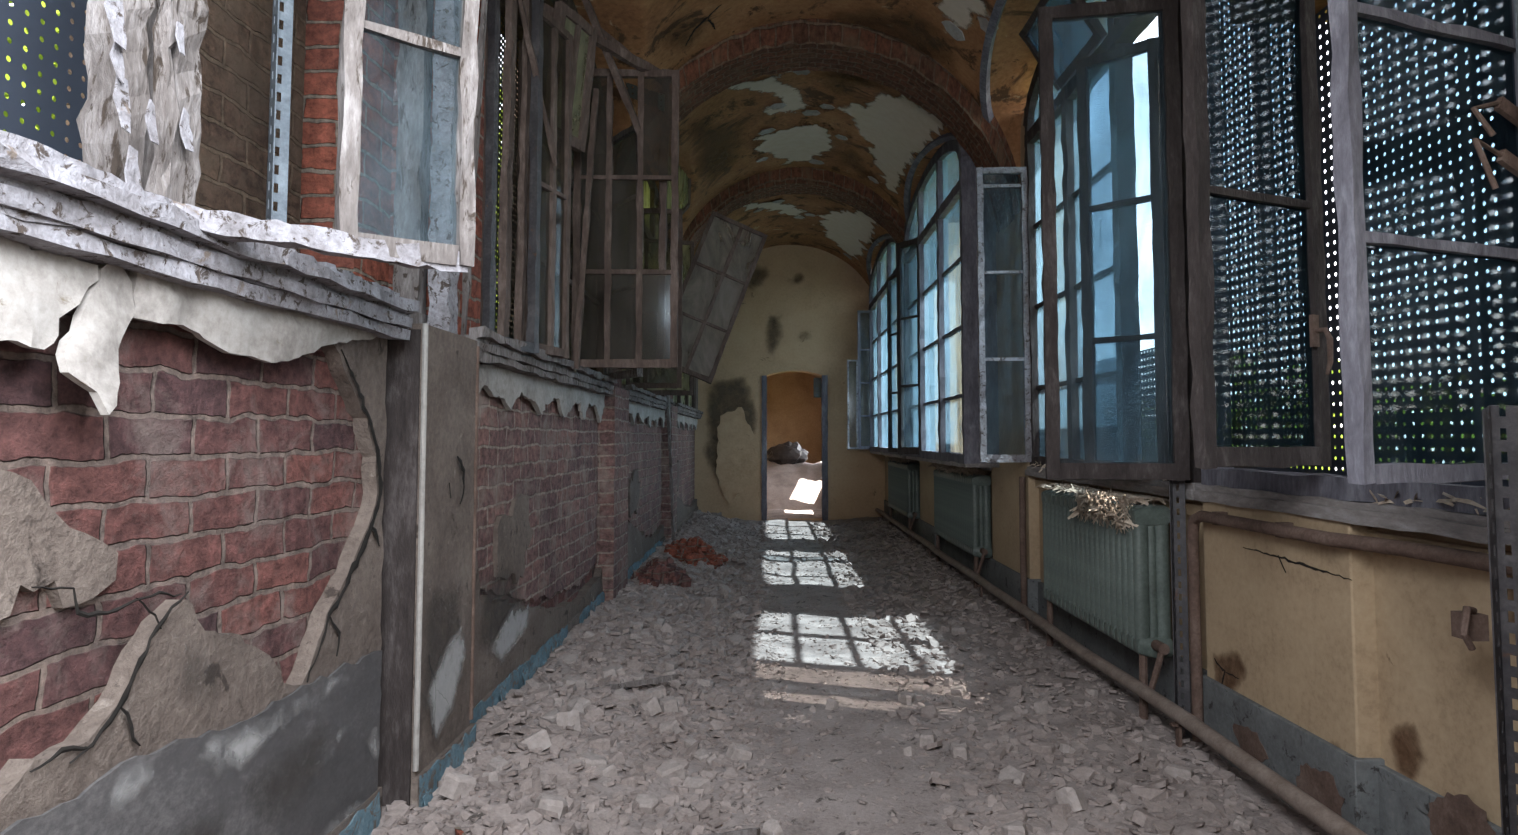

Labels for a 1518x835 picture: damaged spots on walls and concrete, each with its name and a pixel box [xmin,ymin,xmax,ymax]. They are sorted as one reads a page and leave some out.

peeling [728,70,944,194]
peeling [743,200,879,260]
damp [768,318,780,349]
peeling [479,364,605,423]
damp [707,380,755,476]
spalling [0,236,378,770]
crack [307,349,383,683]
crack [1243,547,1352,581]
crack [29,586,189,773]
peeling [419,592,605,808]
rust [1215,655,1244,689]
rust [1394,729,1421,778]